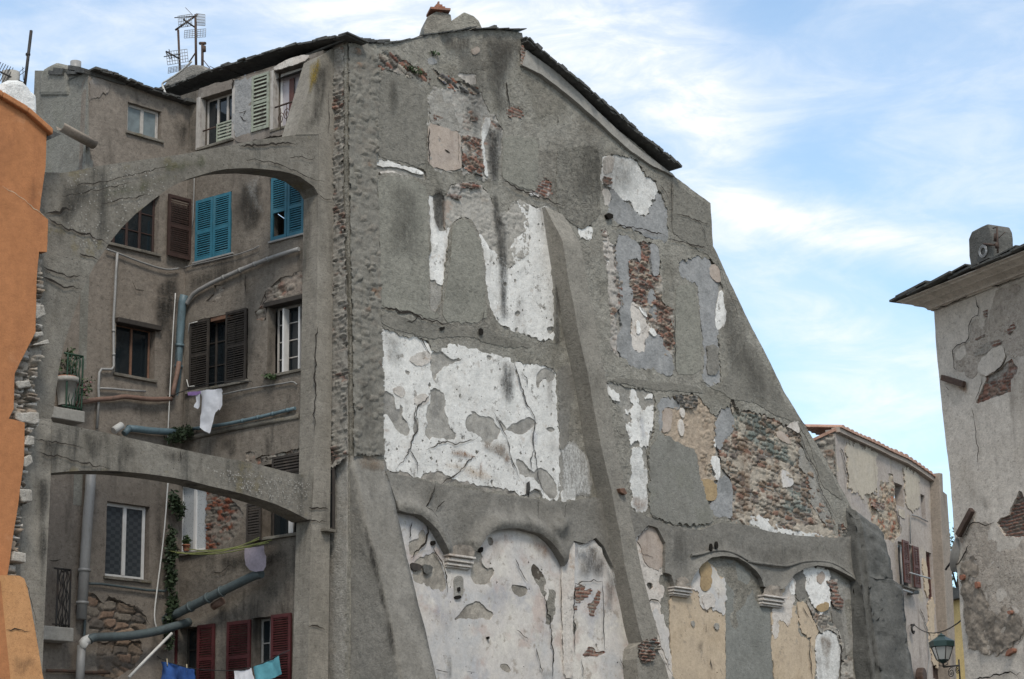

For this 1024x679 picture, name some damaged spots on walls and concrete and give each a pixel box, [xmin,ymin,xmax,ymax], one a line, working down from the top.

crack [4,165,175,290]
crack [311,328,319,429]
peeling [377,50,555,341]
peeling [381,329,593,502]
crack [494,363,567,517]
spalling [577,226,675,357]
peeling [600,155,658,216]
spalling [607,382,847,538]
peeling [954,281,1024,404]
peeling [636,526,727,679]
peeling [770,566,854,679]
peeling [959,492,1024,657]